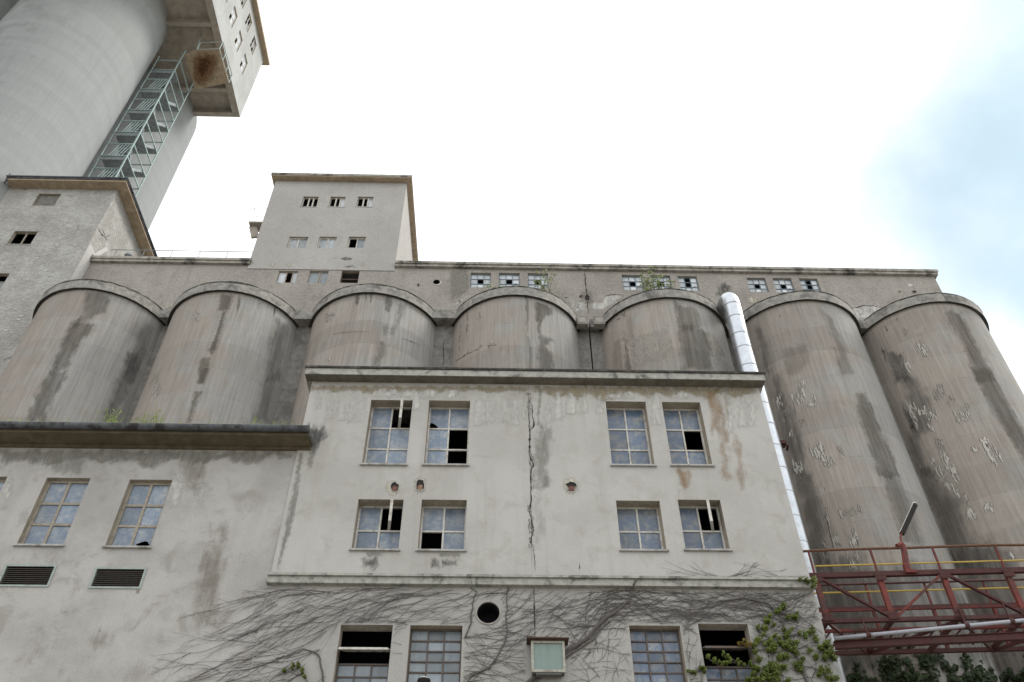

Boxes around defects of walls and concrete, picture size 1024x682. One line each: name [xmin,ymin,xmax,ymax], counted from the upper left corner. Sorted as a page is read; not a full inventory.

leakage [32,319,91,420]
leakage [3,450,286,467]
leakage [281,489,297,553]
crack [526,388,536,571]
leakage [310,386,756,458]
spalling [905,384,995,522]